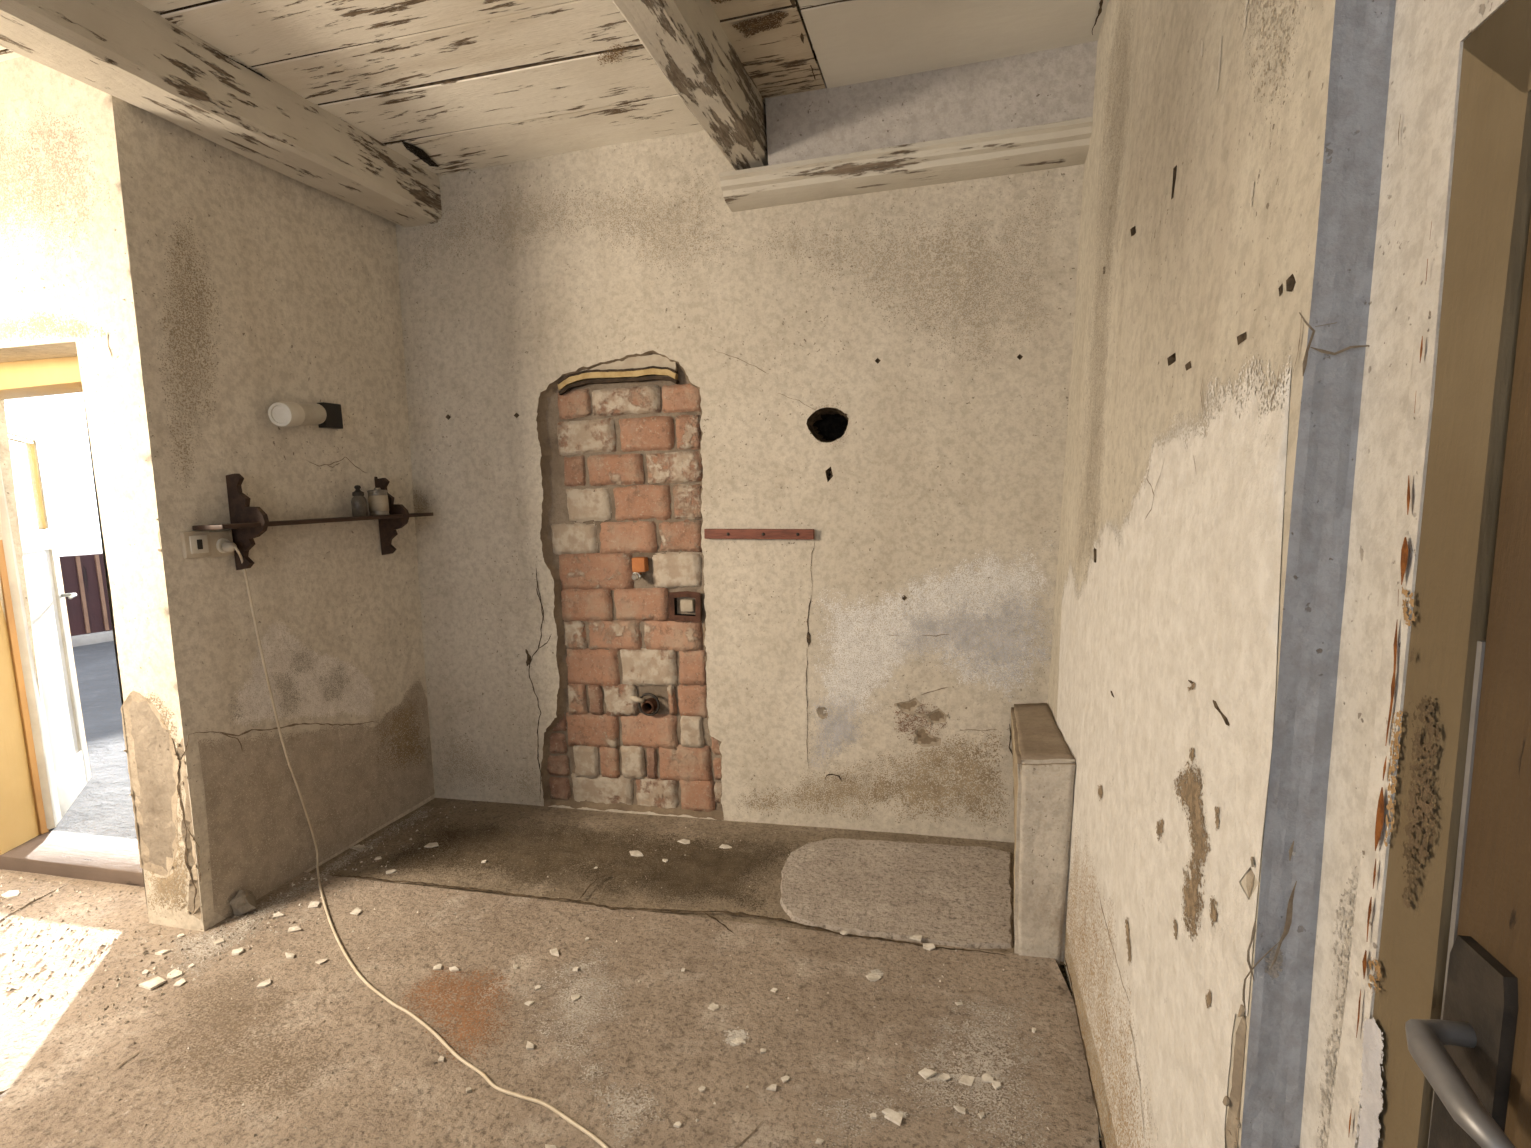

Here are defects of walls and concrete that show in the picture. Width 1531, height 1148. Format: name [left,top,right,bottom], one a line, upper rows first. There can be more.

crack [790,0,852,79]
crack [1092,0,1103,35]
water stain [732,0,1300,1148]
spalling [121,691,202,920]
crack [172,721,374,913]
water stain [140,677,796,1147]
corrosion [1356,537,1416,1038]